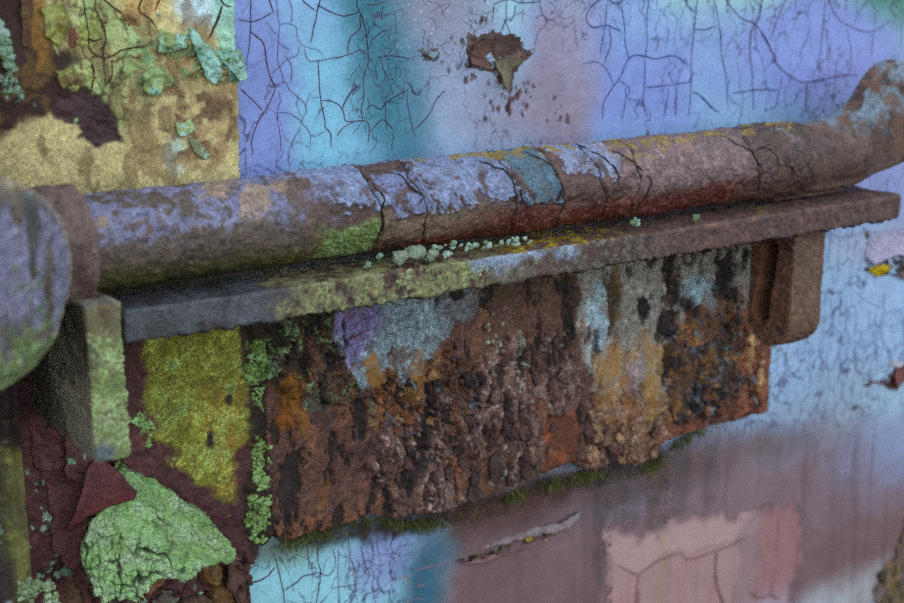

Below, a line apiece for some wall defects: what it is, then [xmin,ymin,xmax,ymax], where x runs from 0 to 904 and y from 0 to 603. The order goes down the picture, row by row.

crack [83,0,160,98]
peeling [157,28,248,85]
peeling [465,32,535,89]
rust [484,82,535,121]
crack [209,0,902,186]
crack [575,143,652,209]
rust [277,374,307,430]
rust [691,382,717,419]
peeling [862,360,904,392]
rust [317,354,661,545]
peeling [28,422,250,603]
crack [253,515,449,603]